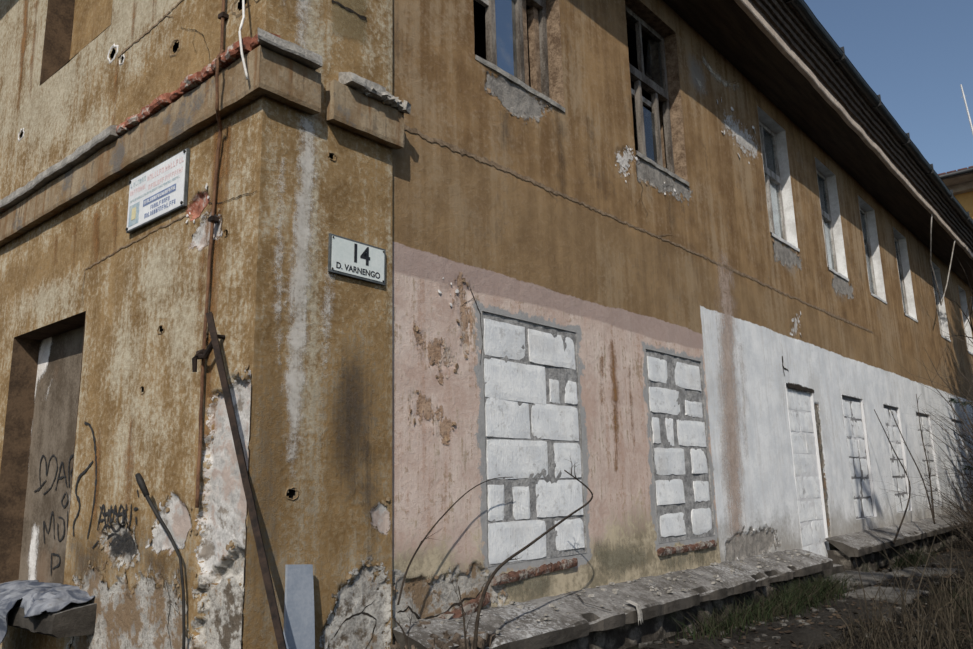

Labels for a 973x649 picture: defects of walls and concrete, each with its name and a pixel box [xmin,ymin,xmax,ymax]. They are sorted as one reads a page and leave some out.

crack [117,0,210,62]
spalling [484,71,552,124]
peeling [717,97,762,164]
spalling [615,145,693,206]
spalling [185,183,229,251]
crack [404,123,873,333]
water stain [286,118,313,457]
peeling [408,390,457,445]
rust [600,342,618,469]
spalling [66,364,252,649]
spalling [319,554,578,649]